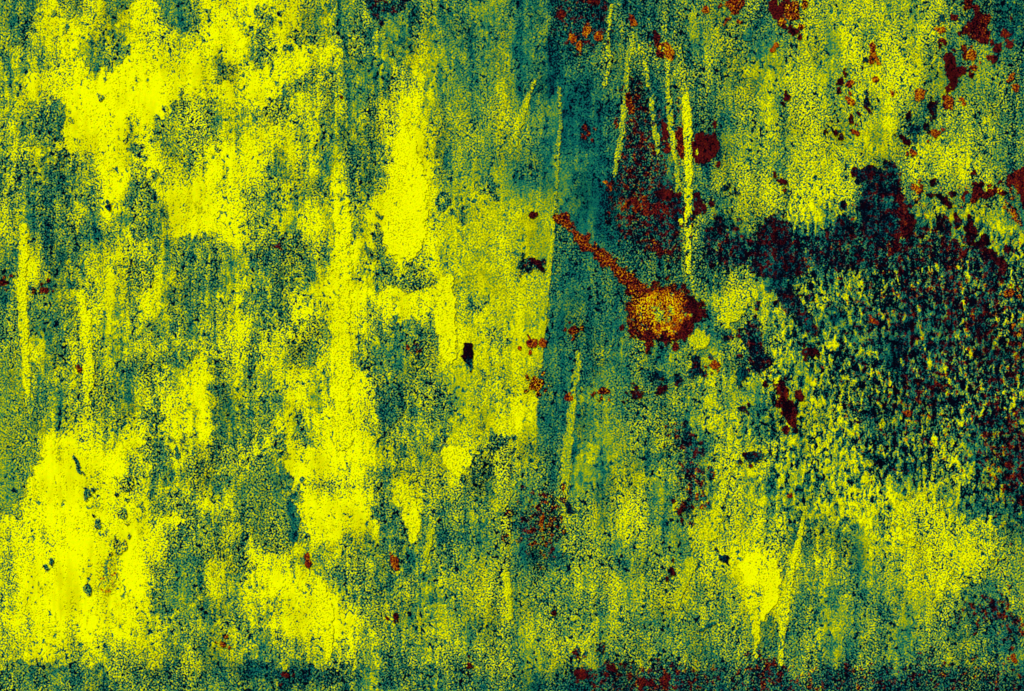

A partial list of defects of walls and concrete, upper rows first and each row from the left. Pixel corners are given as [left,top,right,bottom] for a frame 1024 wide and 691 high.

rust [549,0,614,57]
rust [934,0,1014,110]
rust [552,72,720,354]
rust [961,166,1024,226]
rust [999,284,1021,298]